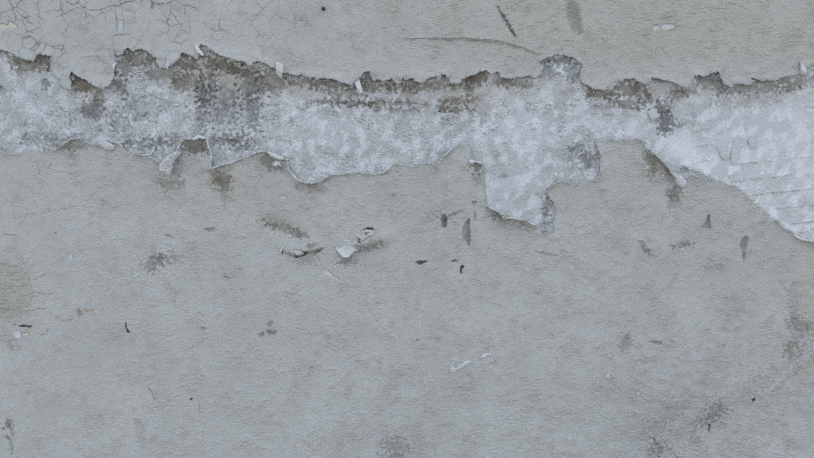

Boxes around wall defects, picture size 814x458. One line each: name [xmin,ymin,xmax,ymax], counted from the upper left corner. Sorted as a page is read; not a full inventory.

peeling [0,44,814,242]
leakage [656,110,676,135]